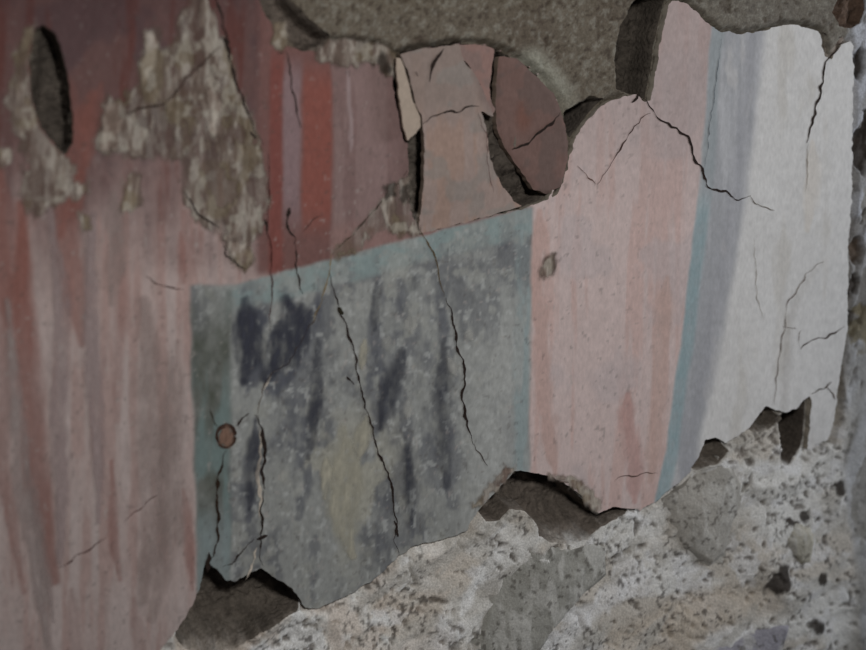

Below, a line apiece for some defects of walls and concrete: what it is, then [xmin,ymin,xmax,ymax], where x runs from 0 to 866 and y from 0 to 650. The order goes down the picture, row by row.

peeling [0,26,88,216]
peeling [96,0,271,272]
peeling [259,0,421,141]
spalling [614,0,663,100]
crack [579,39,774,211]
crack [805,32,843,191]
spalling [823,0,865,58]
crack [118,0,407,580]
crack [418,221,488,466]
crack [754,240,842,405]
peeling [548,473,601,512]
spalling [775,400,805,466]